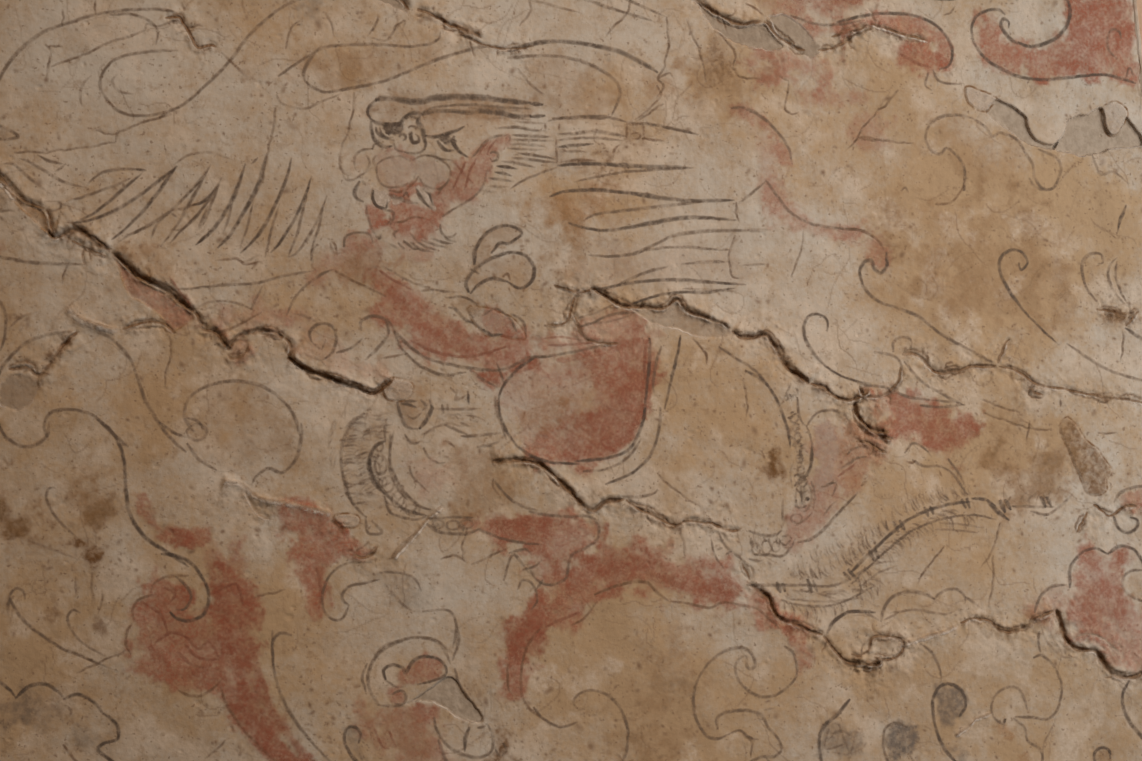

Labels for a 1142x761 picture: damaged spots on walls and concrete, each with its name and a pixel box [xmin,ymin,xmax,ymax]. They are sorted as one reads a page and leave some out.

crack [372,0,532,51]
crack [699,3,926,51]
flaking render [965,86,1142,157]
crack [0,175,392,395]
crack [551,285,1142,452]
crack [492,458,738,532]
crack [1077,504,1136,532]
crack [743,565,1142,679]